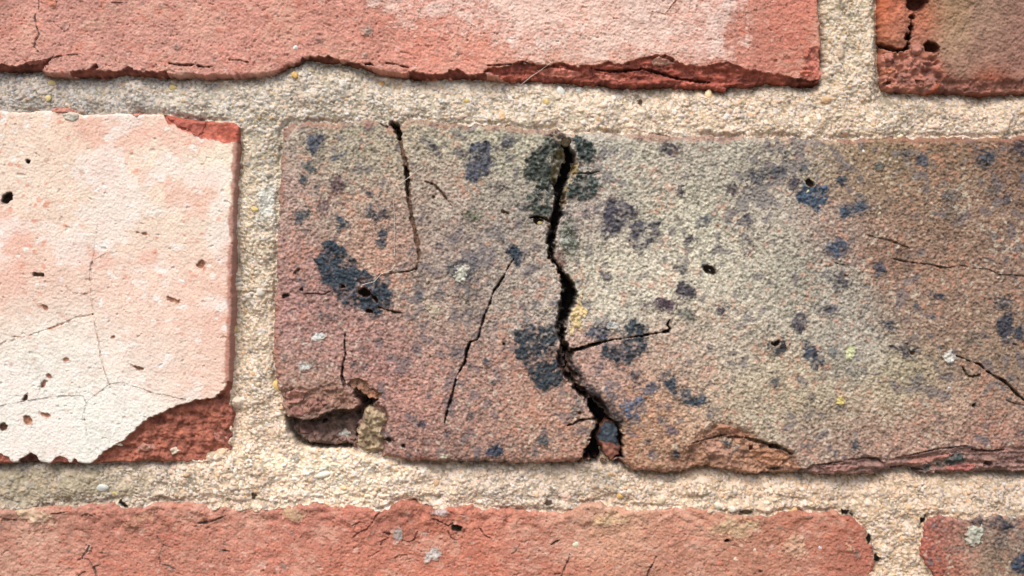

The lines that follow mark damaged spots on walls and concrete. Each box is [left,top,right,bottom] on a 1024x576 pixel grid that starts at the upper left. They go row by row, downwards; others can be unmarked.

spalling [0,56,54,74]
spalling [70,63,171,80]
spalling [408,43,822,94]
spalling [876,0,1024,99]
crack [379,122,452,276]
crack [305,289,332,297]
crack [377,305,403,314]
crack [529,138,671,460]
crack [444,258,515,438]
spalling [0,381,236,464]
spalling [277,374,382,446]
spalling [663,418,1024,475]